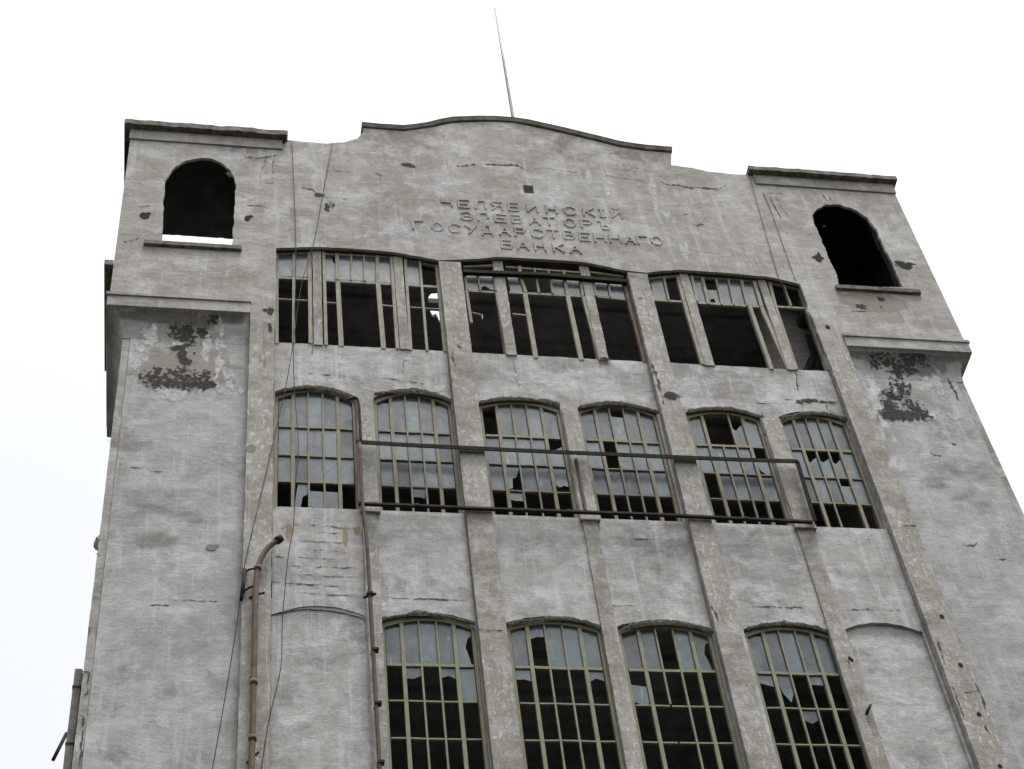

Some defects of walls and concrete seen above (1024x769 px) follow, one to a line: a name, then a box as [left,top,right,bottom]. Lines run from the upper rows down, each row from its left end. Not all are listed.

flaking render [130,314,241,393]
spalling [867,351,938,422]